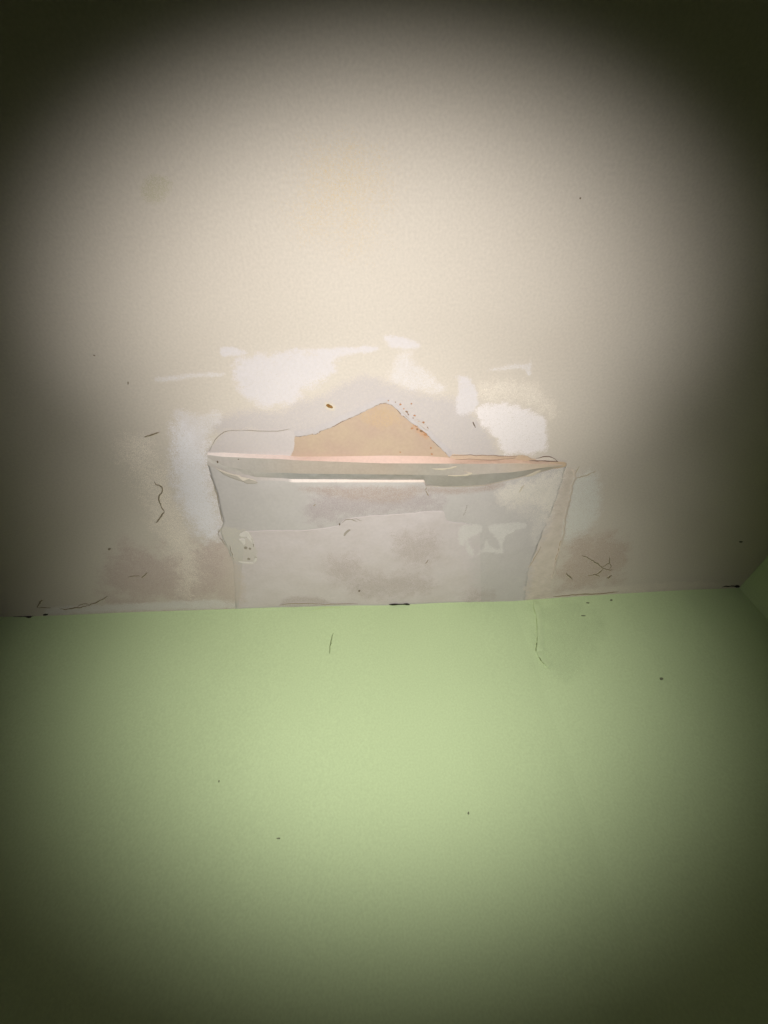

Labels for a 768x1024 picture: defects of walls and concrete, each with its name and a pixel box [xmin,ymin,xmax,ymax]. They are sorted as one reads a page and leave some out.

peeling [291,396,452,458]
crack [154,482,164,523]
crack [566,555,612,580]